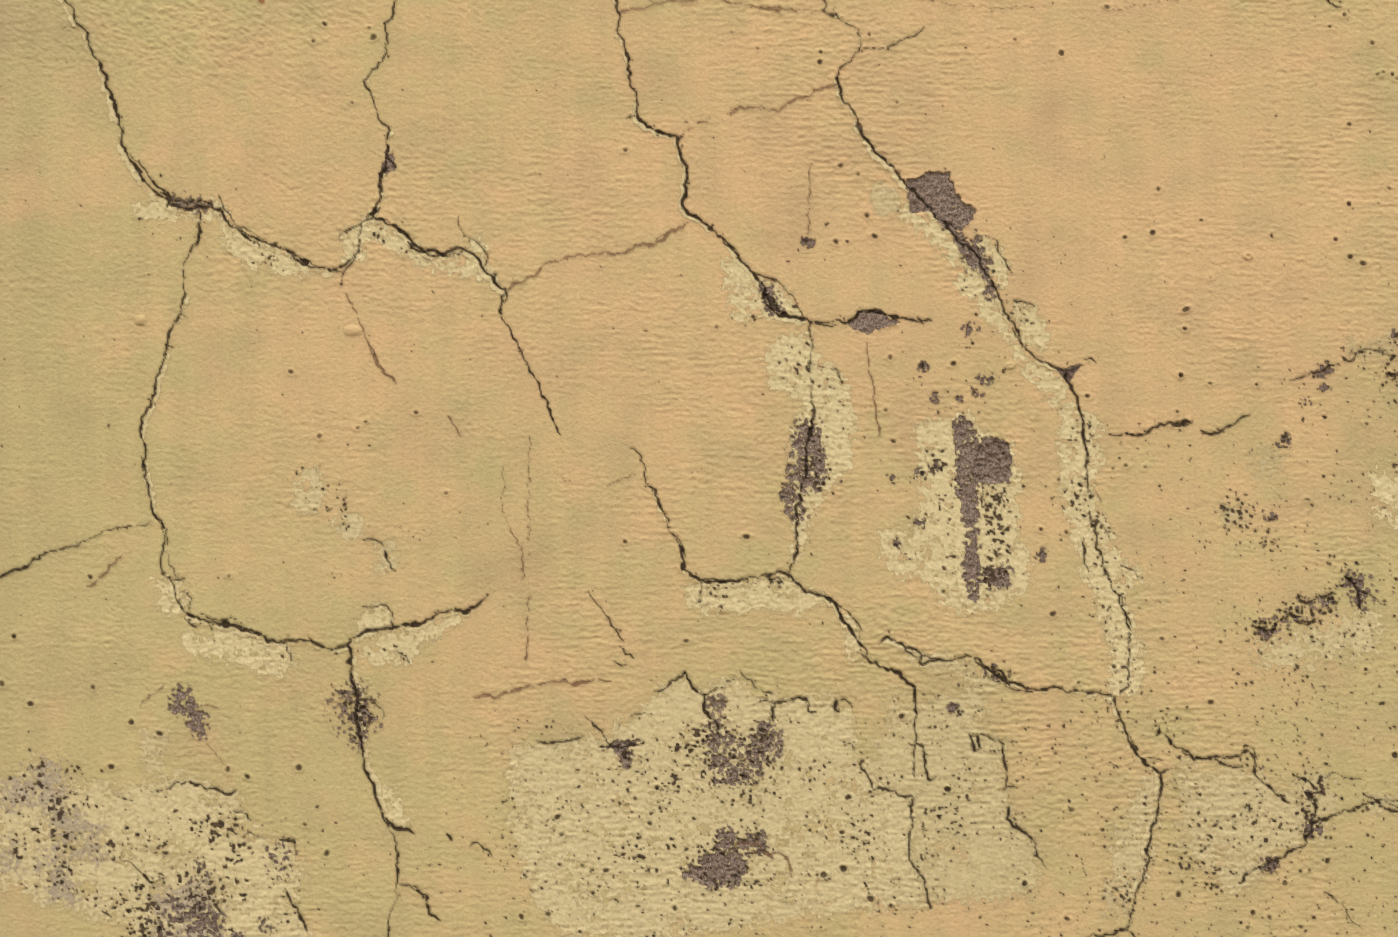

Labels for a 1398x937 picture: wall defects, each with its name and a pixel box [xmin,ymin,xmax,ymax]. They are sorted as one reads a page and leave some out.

crack [0,0,932,937]
peeling [681,256,865,665]
spalling [849,309,900,334]
crack [613,0,1398,937]
peeling [865,171,1164,697]
spalling [1272,432,1292,458]
peeling [1237,543,1396,674]
spalling [1298,329,1398,422]
peeling [1364,462,1398,530]
peeling [0,683,315,937]
peeling [505,650,1043,937]